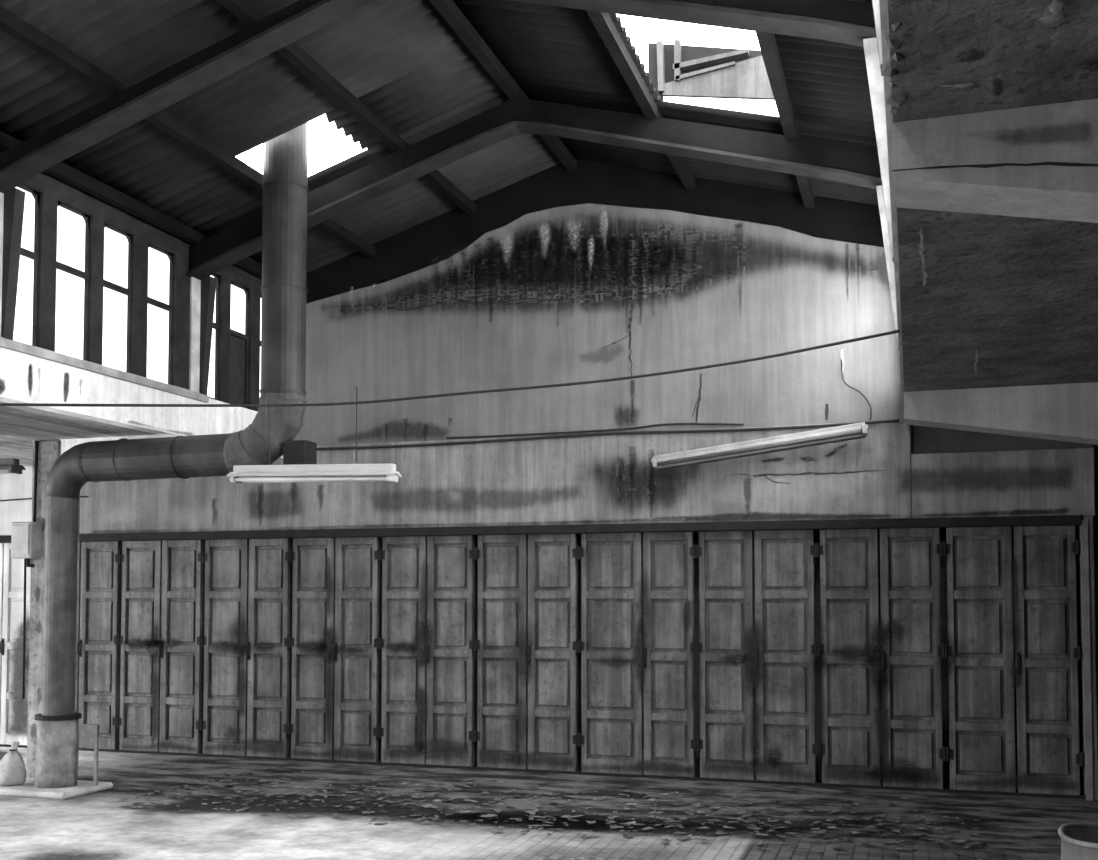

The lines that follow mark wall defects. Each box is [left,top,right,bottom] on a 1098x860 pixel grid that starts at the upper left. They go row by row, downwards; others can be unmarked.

water stain [324,217,889,321]
water stain [506,447,891,524]
water stain [924,508,1067,517]
water stain [207,739,574,767]
water stain [602,759,803,775]
water stain [824,765,939,783]
water stain [966,773,1076,789]
crack [26,852,117,860]